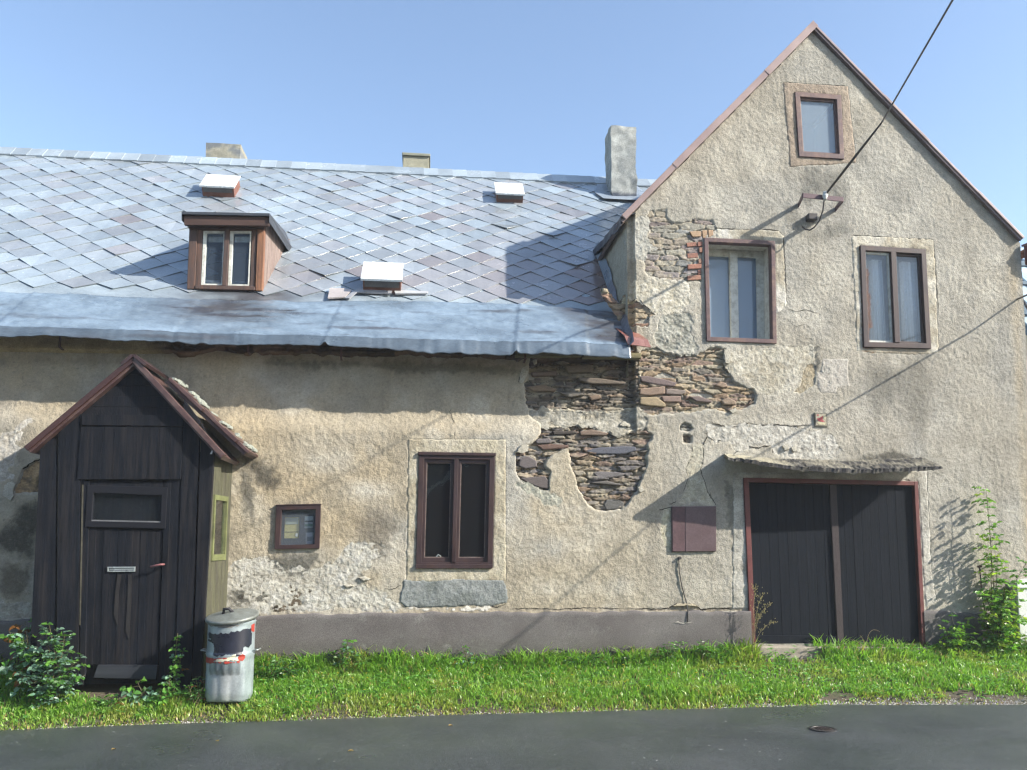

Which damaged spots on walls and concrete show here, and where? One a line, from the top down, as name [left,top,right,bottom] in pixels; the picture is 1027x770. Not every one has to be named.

spalling [515,209,841,554]
flaking render [0,418,40,501]
leakage [243,461,279,508]
crack [660,422,805,510]
leakage [0,505,37,556]
flaking render [226,541,405,615]